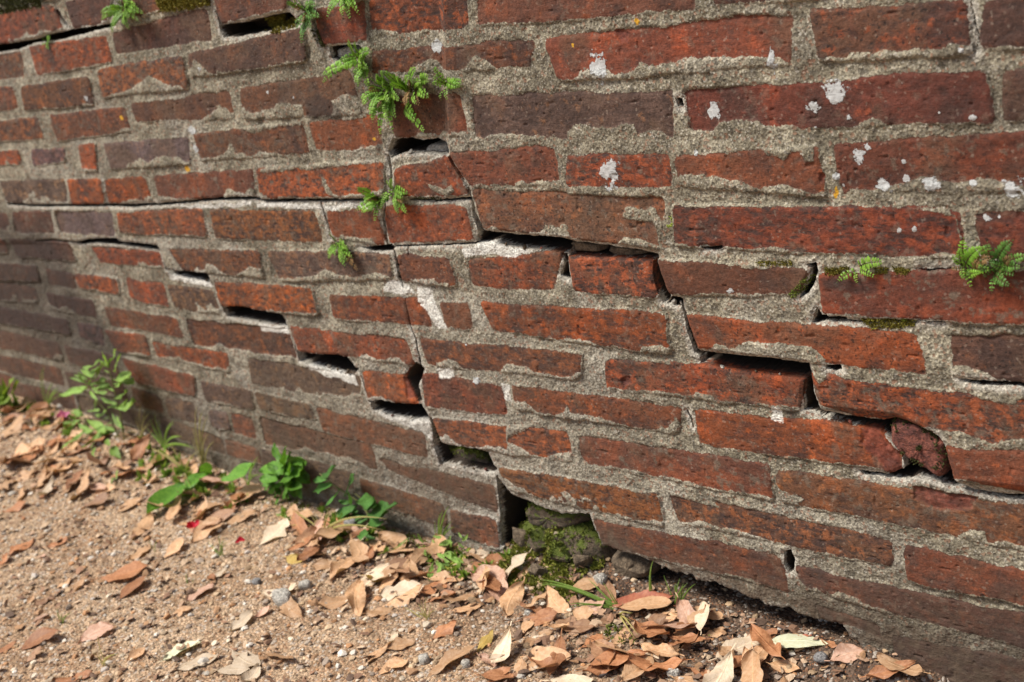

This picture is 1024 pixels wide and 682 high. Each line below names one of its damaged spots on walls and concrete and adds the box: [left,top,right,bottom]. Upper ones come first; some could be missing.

water stain [832,10,1024,261]
crack [7,137,1024,551]